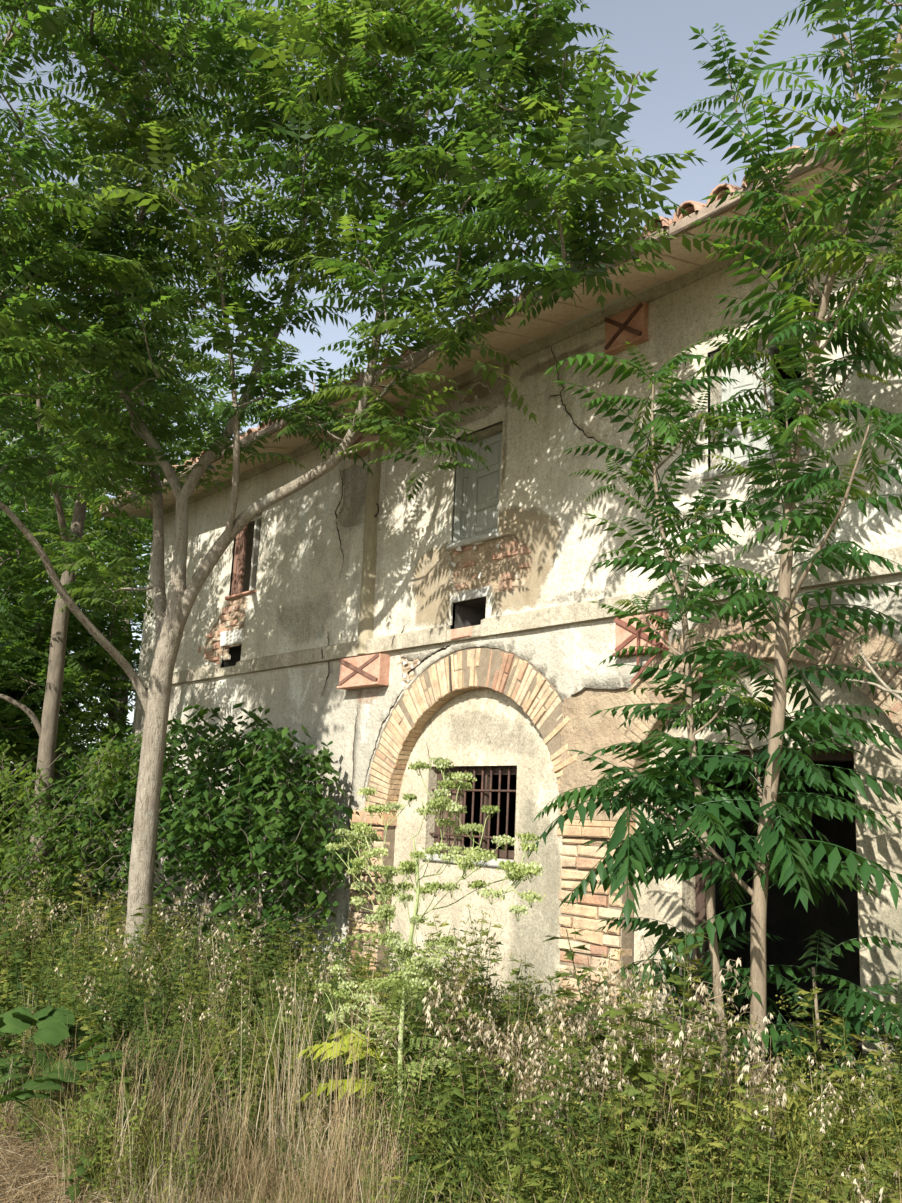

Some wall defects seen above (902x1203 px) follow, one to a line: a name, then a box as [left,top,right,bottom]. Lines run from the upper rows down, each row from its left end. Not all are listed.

crack [335,470,344,573]
spalling [451,535,533,593]
spalling [198,597,246,664]